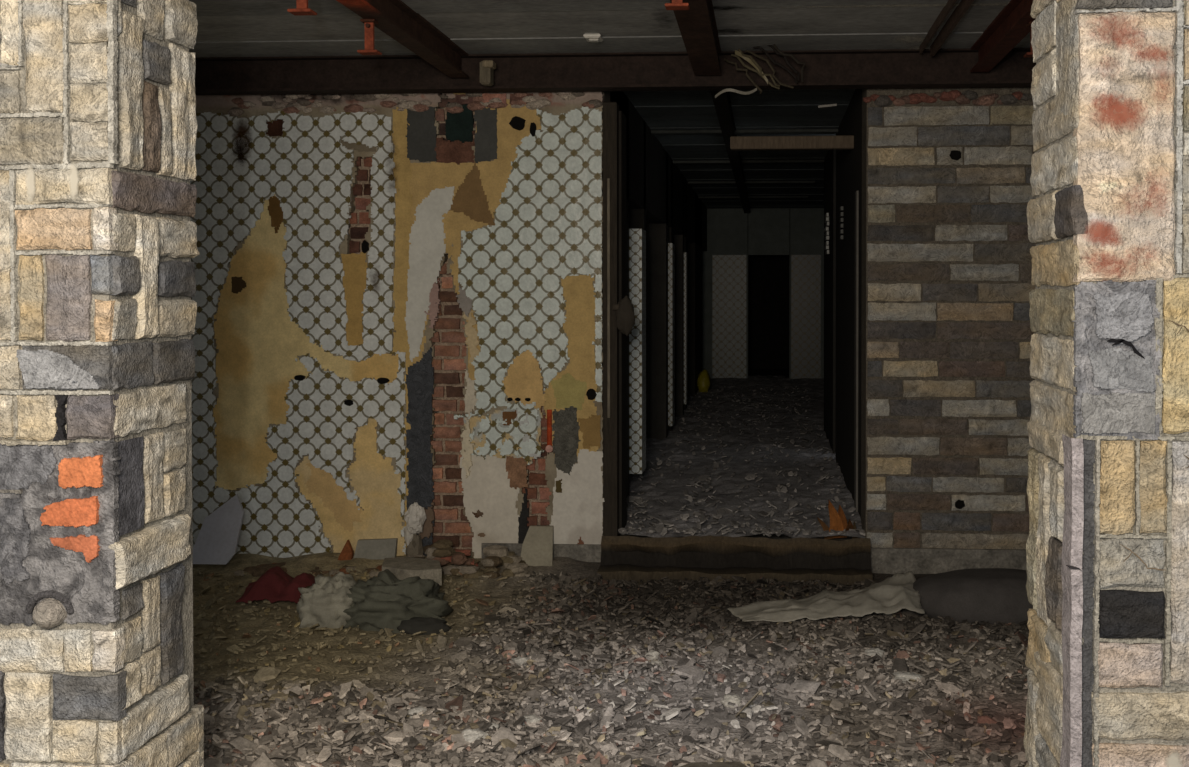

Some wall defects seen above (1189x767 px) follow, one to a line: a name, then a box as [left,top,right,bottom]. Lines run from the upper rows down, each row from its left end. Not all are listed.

rust [1101,96,1137,125]
rust [1089,223,1117,242]
peeling [213,92,605,558]
crack [1107,338,1145,359]